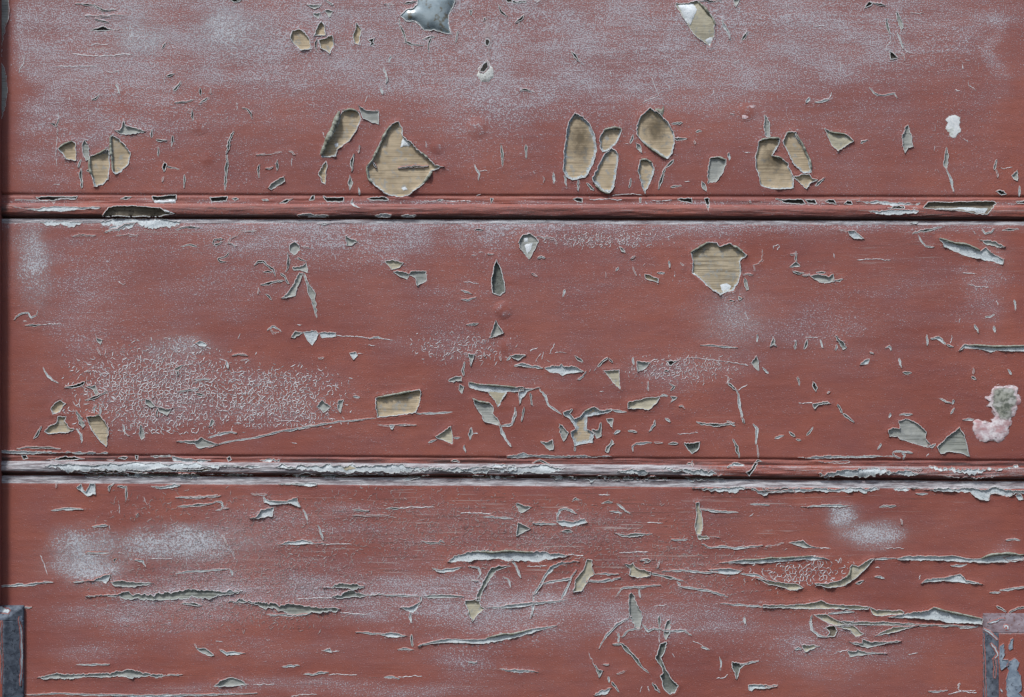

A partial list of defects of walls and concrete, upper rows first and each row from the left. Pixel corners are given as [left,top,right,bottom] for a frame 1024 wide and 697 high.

peeling [399,0,456,35]
peeling [675,0,716,47]
peeling [57,120,146,188]
peeling [318,105,445,198]
peeling [562,105,676,194]
peeling [754,114,818,190]
peeling [253,241,390,346]
peeling [690,241,748,301]
peeling [938,238,1006,265]
peeling [1,353,1024,542]
peeling [71,539,1024,697]